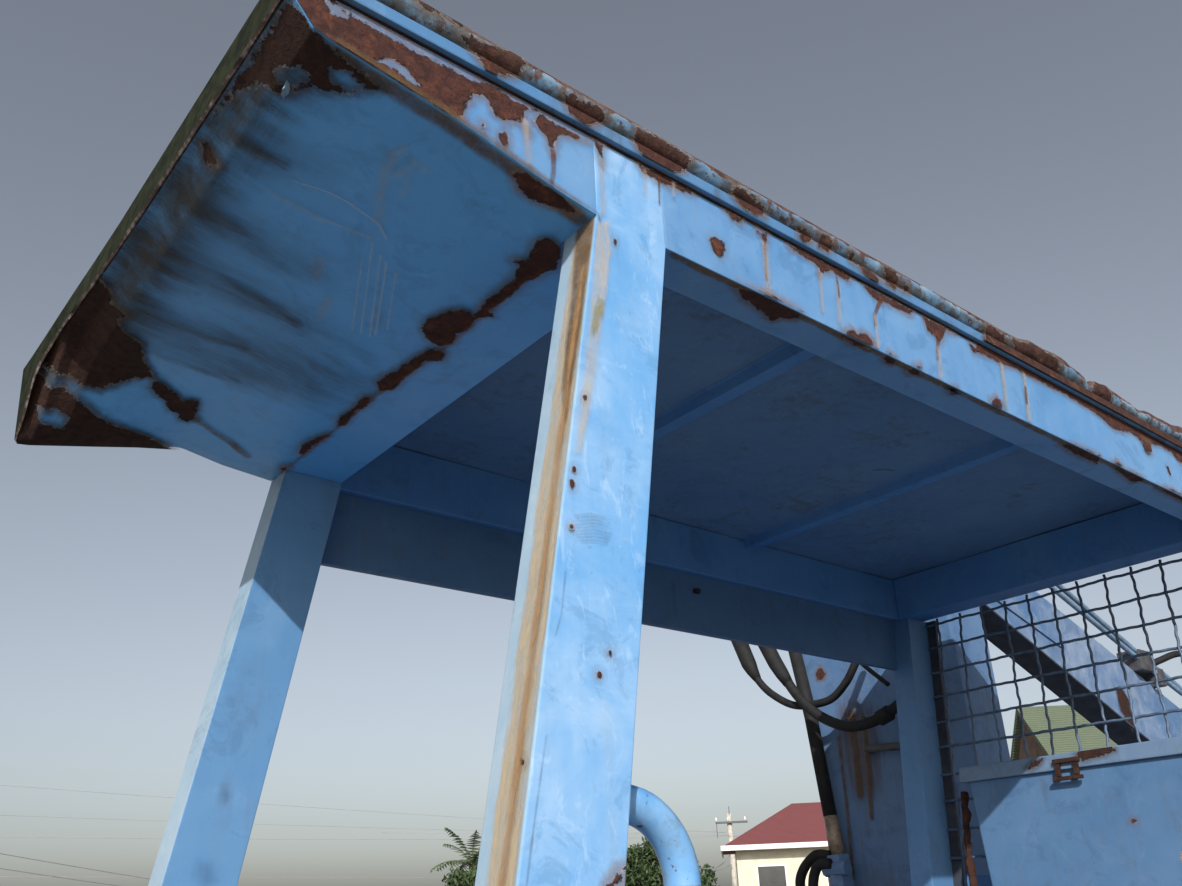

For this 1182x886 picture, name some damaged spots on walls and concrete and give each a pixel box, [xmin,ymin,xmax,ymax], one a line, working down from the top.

peeling [281,81,290,100]
rust [631,124,695,203]
rust [726,181,767,223]
rust [16,278,249,458]
rust [213,0,617,886]
rust [670,226,1182,502]
rust [838,711,874,879]